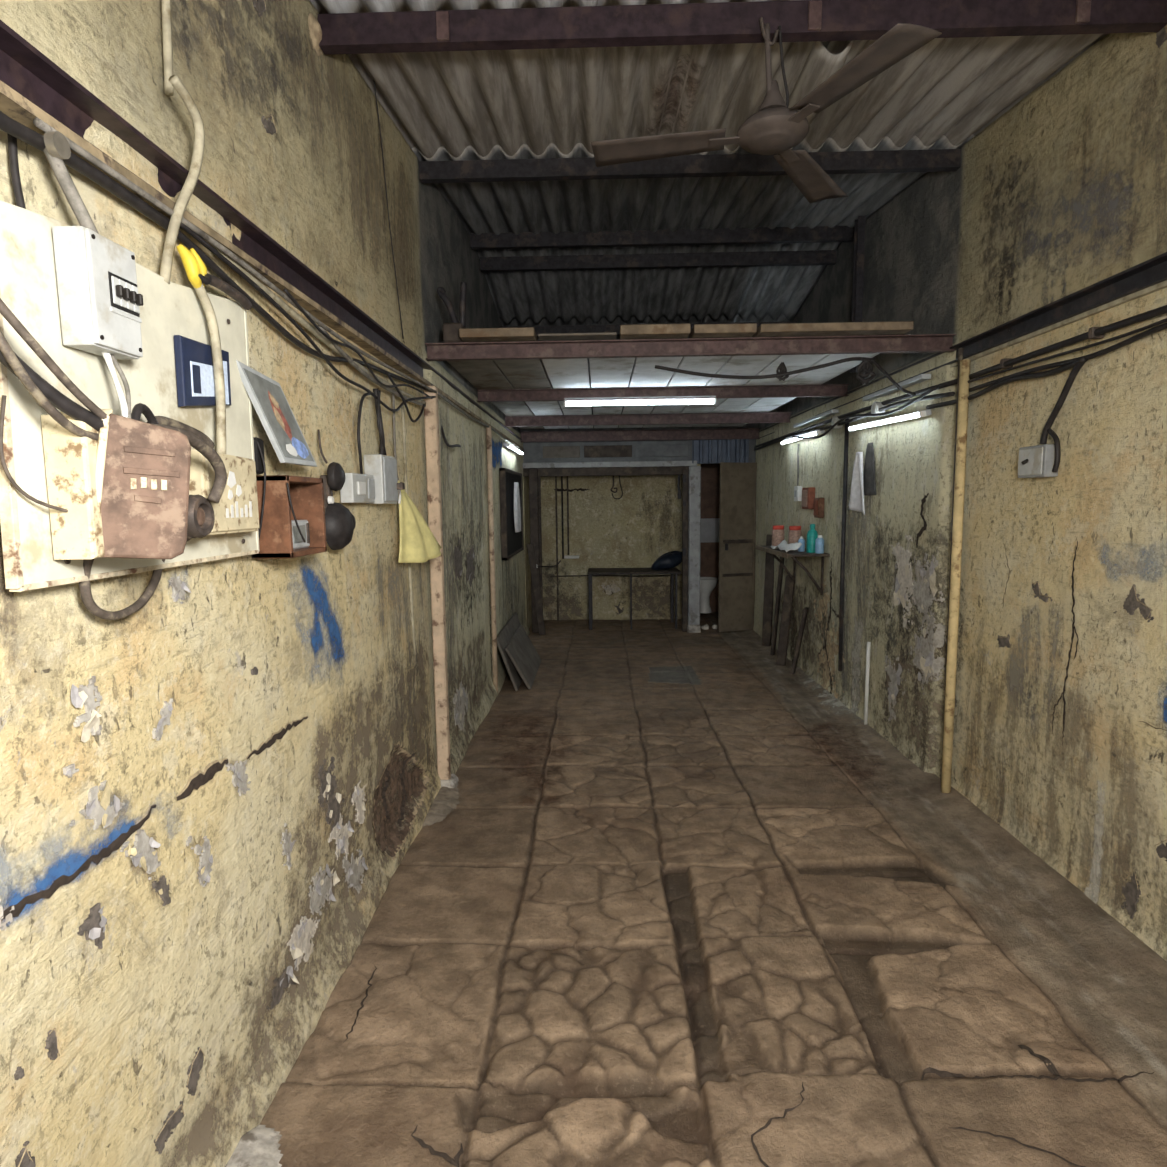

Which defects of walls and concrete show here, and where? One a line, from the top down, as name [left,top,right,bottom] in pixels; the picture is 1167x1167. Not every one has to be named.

water stain [171,0,414,293]
water stain [982,81,1167,316]
crack [0,716,308,921]
water stain [162,557,437,1167]
flaking render [266,741,430,1010]
water stain [440,411,496,772]
water stain [779,483,1156,931]
crack [751,1082,805,1167]
crack [948,1127,1086,1167]